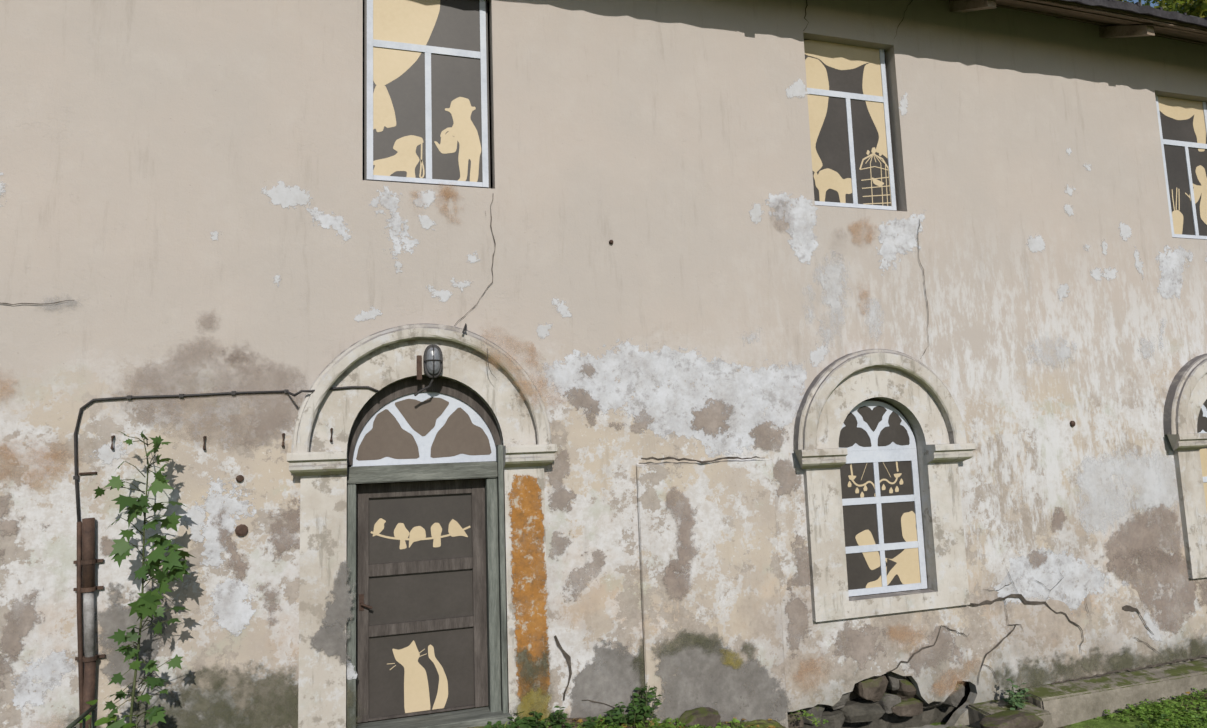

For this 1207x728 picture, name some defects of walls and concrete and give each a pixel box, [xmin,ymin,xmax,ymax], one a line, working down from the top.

peeling [261,180,352,241]
crack [0,298,72,306]
crack [454,200,496,326]
peeling [536,192,846,497]
spalling [548,450,577,512]
crack [641,455,760,463]
peeling [184,477,300,637]
rust [508,474,551,713]
spalling [564,549,606,601]
damp [632,630,723,705]
crack [888,568,1089,685]
crack [1052,605,1207,685]